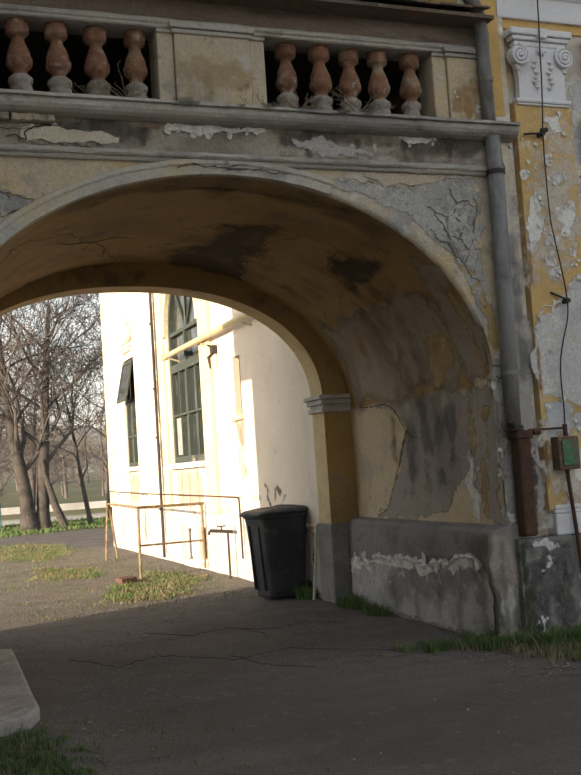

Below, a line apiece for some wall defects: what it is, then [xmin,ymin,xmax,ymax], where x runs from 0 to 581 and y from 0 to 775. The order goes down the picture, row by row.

peeling [0,111,119,147]
spalling [140,122,266,140]
peeling [292,135,377,159]
peeling [398,136,437,148]
spalling [0,189,35,216]
damp [169,225,279,280]
spalling [501,80,581,513]
spalling [331,173,517,525]
spalling [350,550,495,636]
crack [72,622,351,668]